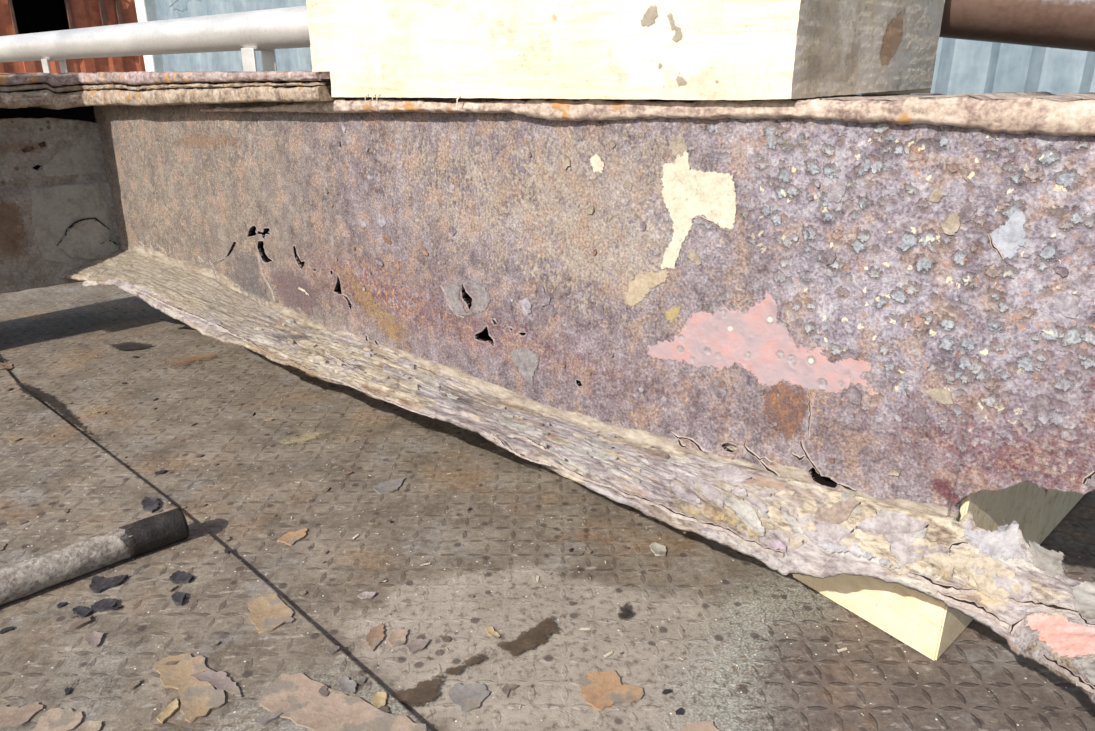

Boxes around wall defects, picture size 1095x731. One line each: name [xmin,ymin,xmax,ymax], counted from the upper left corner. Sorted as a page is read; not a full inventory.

crack [57,218,166,253]
peeling [624,133,737,306]
crack [257,253,275,301]
corrosion [270,265,321,314]
peeling [647,291,879,405]
corrosion [760,381,811,441]
crack [743,389,856,492]
corrosion [141,496,160,513]
crack [491,431,784,557]
peeling [671,465,955,579]
corrosion [933,479,960,504]
peeling [952,518,1067,600]